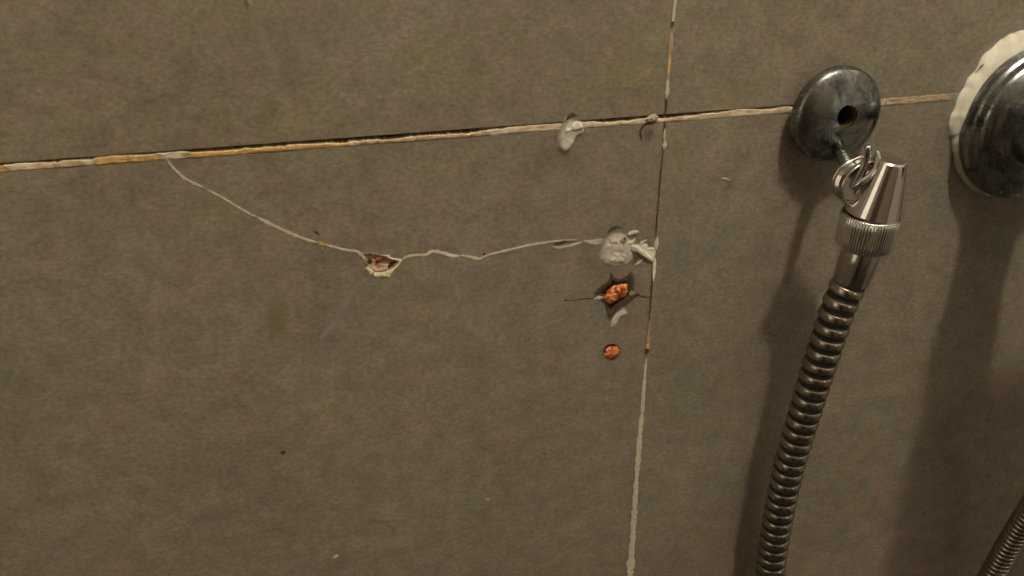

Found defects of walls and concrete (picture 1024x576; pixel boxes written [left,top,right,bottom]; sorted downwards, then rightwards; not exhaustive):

crack [164,157,368,261]
crack [402,218,592,260]
hole [361,253,402,278]
peeling [610,309,628,327]